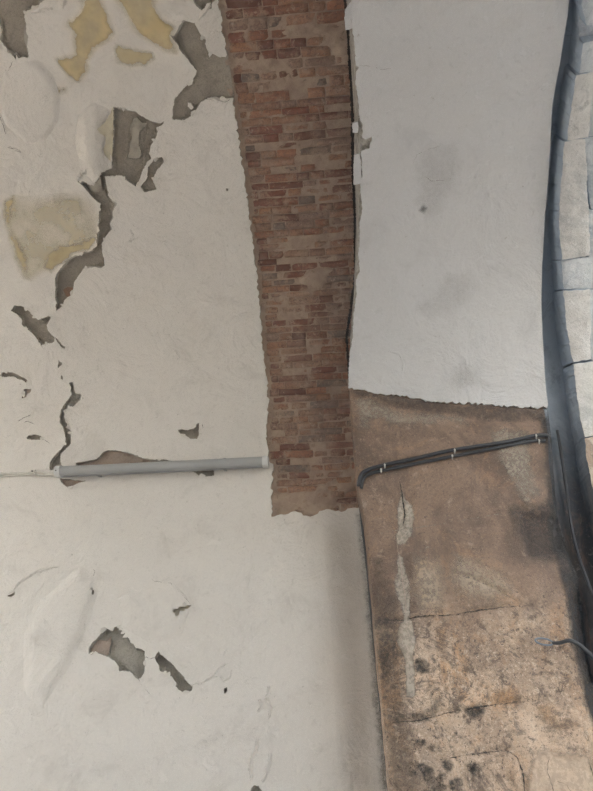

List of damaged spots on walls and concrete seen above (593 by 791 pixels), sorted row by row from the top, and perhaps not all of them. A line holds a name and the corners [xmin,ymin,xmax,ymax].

peeling [0,0,43,57]
damp [58,0,112,80]
damp [116,47,152,64]
damp [121,0,172,48]
peeling [172,20,235,120]
peeling [14,107,164,348]
flaking render [77,450,168,465]
crack [391,575,530,621]
flaking render [89,627,193,693]
damp [377,482,463,791]
damp [466,706,484,716]
crack [441,751,525,791]